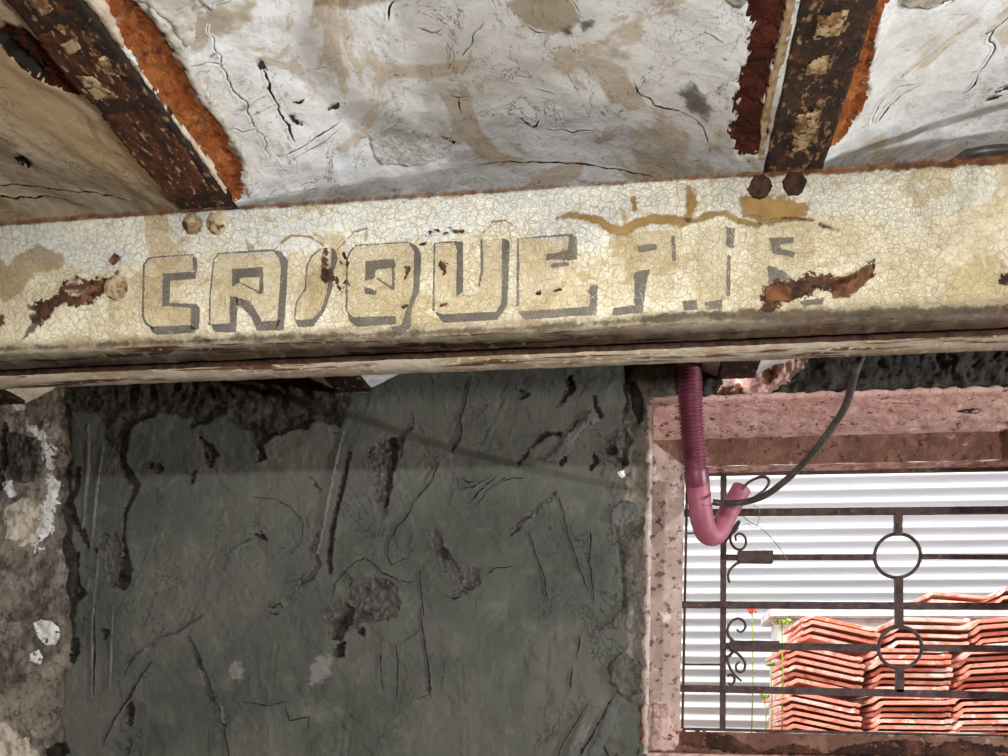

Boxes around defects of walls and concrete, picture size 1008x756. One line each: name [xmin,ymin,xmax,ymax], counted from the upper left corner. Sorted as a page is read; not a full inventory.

flaking render [105,0,254,202]
spalling [258,61,305,143]
peeling [364,125,456,167]
flaking render [830,0,946,147]
crack [963,14,1008,94]
rust [24,253,121,338]
rust [759,259,876,313]
peeling [26,421,64,553]
crack [332,375,473,701]
crack [557,495,596,601]
crack [102,660,154,756]
crack [242,698,311,731]